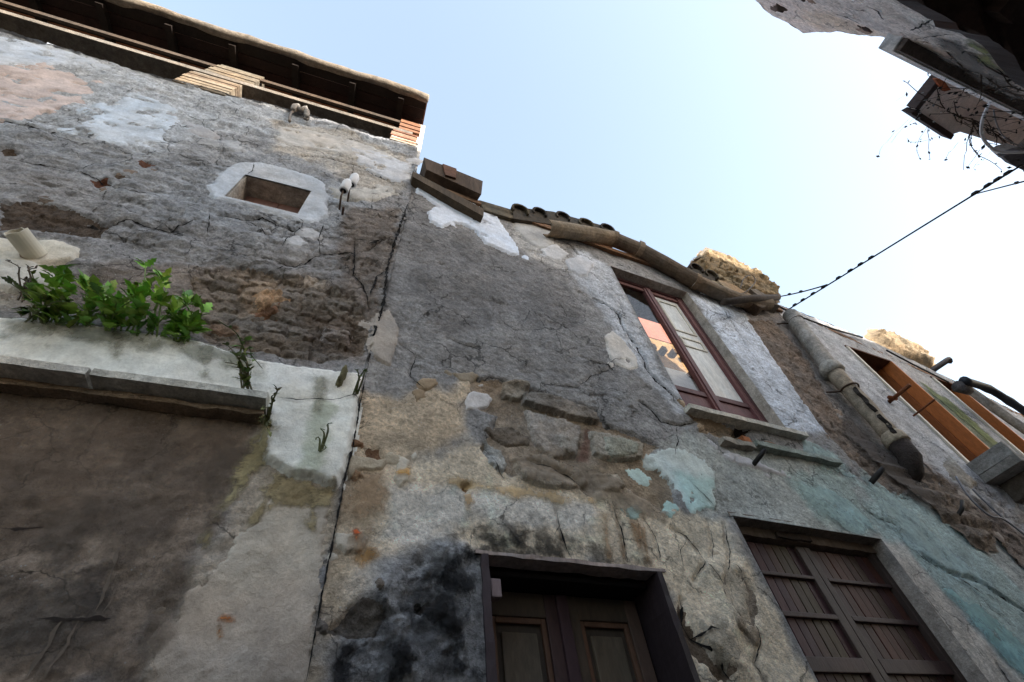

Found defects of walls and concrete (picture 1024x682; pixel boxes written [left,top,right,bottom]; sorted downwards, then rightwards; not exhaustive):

crack [8,122,145,193]
flaking render [0,37,249,152]
flaking render [277,126,593,277]
damp [0,393,252,568]
crack [66,149,409,681]
spalling [190,268,399,388]
spalling [412,370,716,520]
crack [553,295,717,453]
damp [332,644,364,682]
damp [388,636,415,682]
damp [423,555,480,682]
crack [614,489,766,682]